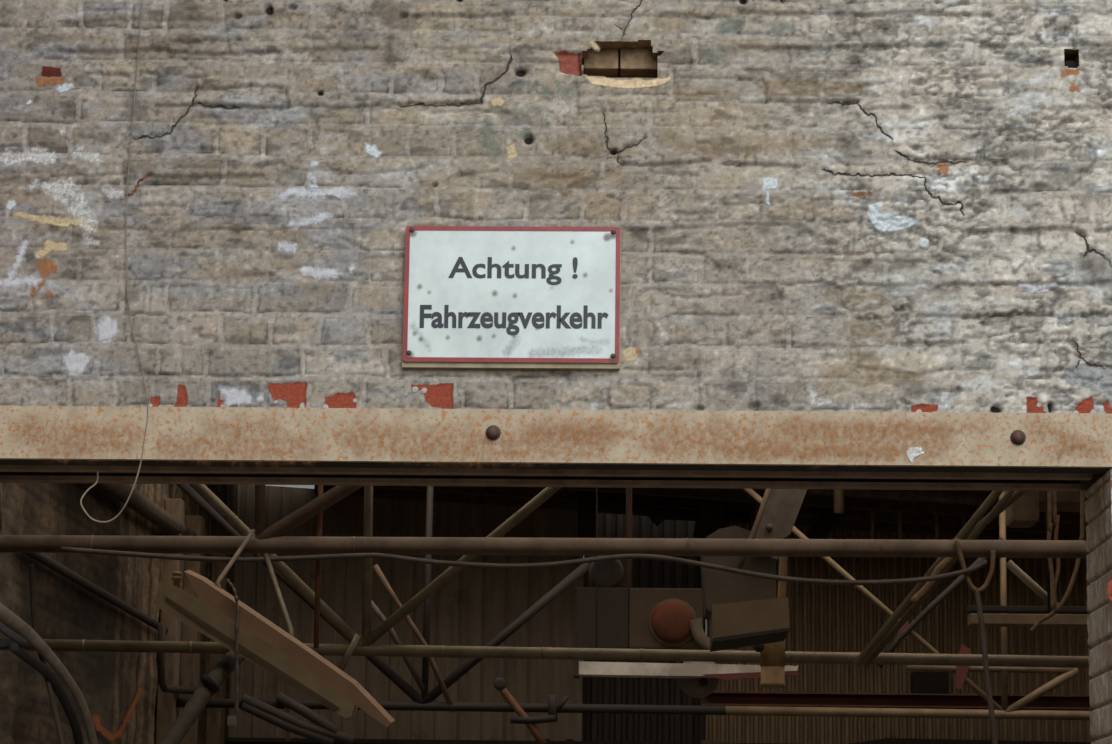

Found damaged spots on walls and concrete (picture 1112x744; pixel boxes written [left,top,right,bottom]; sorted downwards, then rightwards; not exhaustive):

crack [616,0,642,38]
crack [400,53,513,107]
spalling [536,40,671,112]
crack [133,87,240,139]
crack [603,113,647,165]
crack [822,101,966,216]
crack [1076,232,1112,268]
crack [1074,342,1111,369]
spalling [268,382,307,408]
spalling [411,383,454,409]